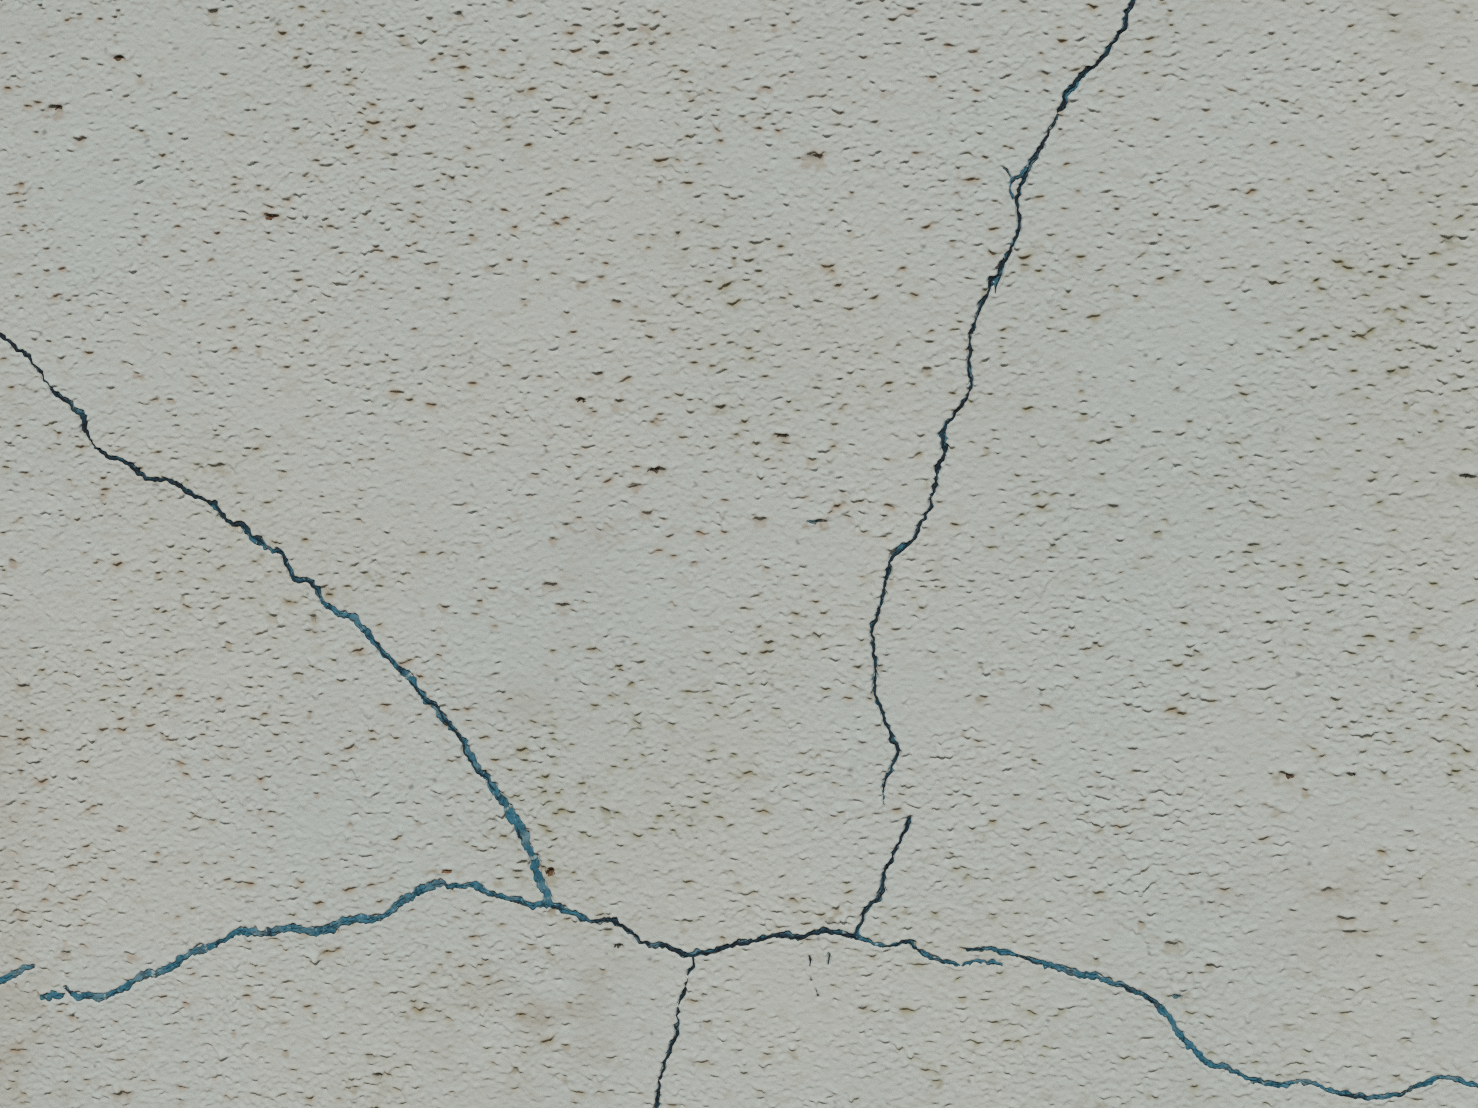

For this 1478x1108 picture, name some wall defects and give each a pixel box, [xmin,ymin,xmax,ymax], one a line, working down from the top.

crack [0,333,1478,1108]
crack [870,0,1136,804]